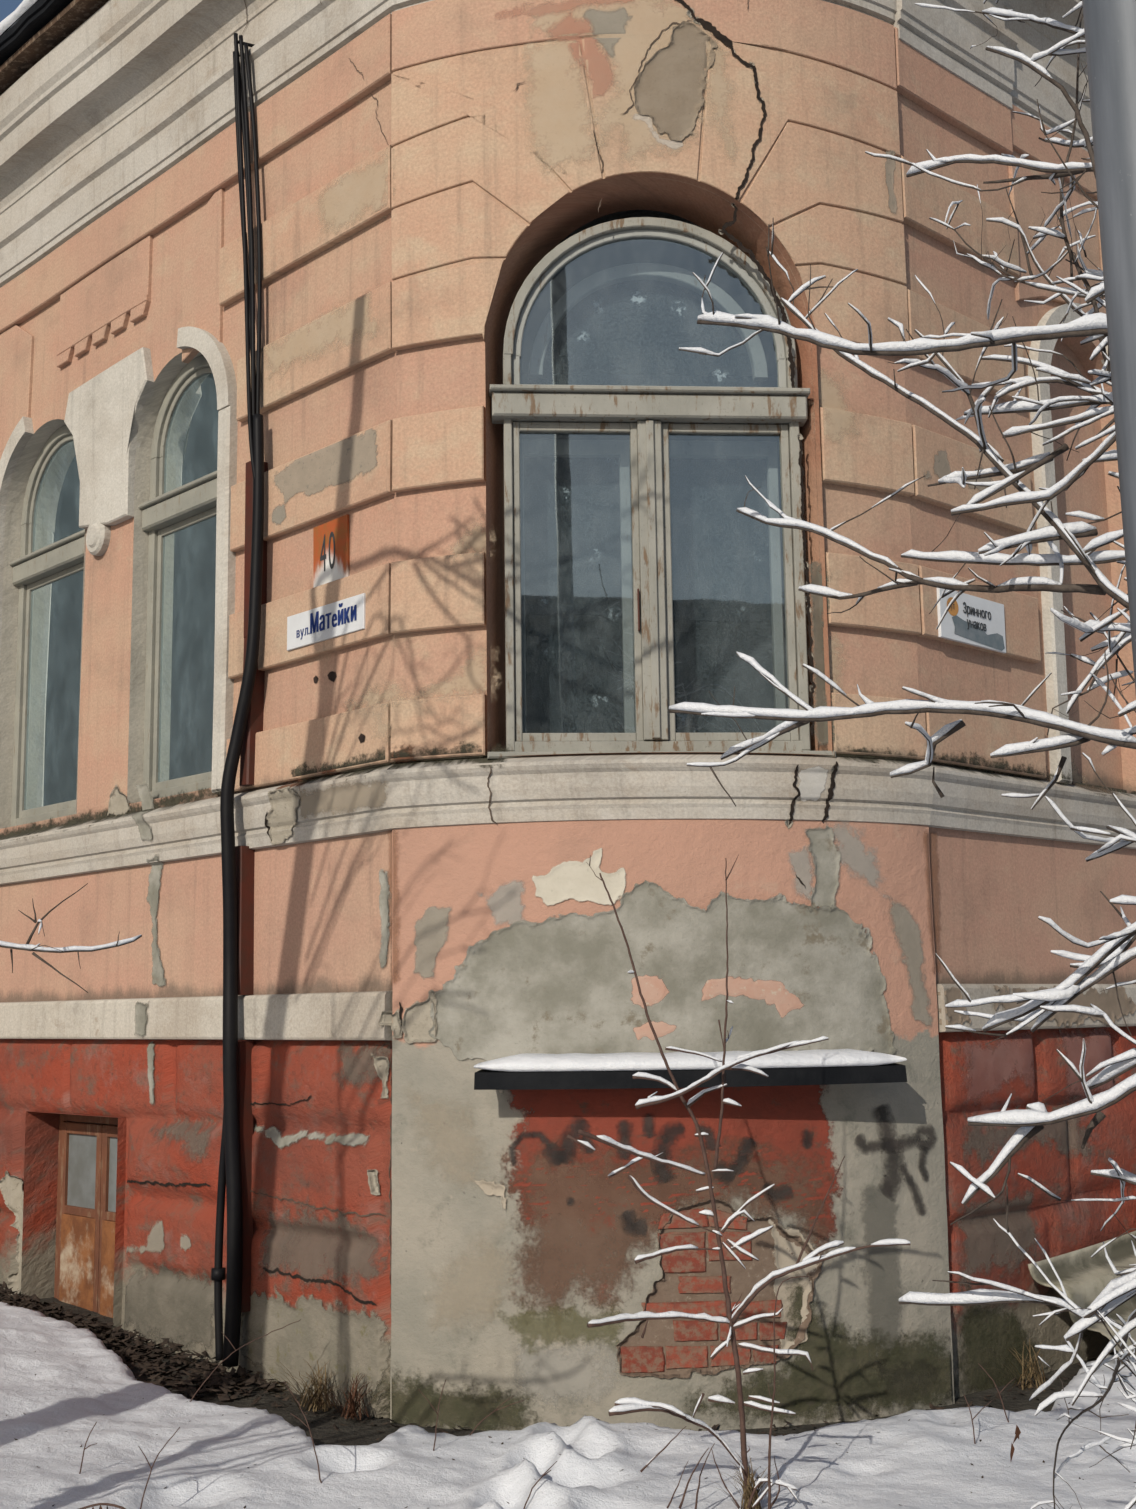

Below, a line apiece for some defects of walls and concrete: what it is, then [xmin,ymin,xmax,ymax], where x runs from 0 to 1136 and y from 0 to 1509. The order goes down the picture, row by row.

peeling [499,0,718,169]
crack [593,0,795,388]
peeling [274,429,377,503]
crack [785,434,838,829]
peeling [266,781,386,845]
peeling [532,848,626,906]
peeling [631,975,676,1040]
peeling [702,977,804,1018]
peeling [890,901,971,1026]
peeling [993,983,1136,1031]
flaking render [0,1171,24,1295]
flaking render [615,1198,822,1379]